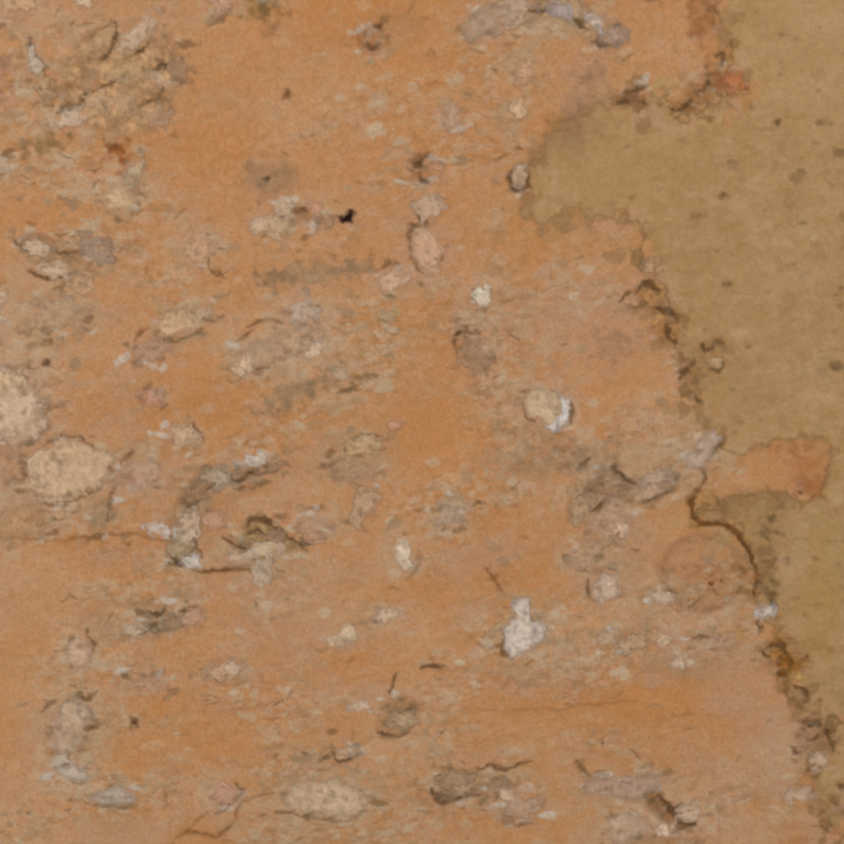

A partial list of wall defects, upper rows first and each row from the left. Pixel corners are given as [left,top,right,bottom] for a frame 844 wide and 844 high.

spalling [467,0,630,47]
peeling [509,0,844,844]
crack [689,498,756,567]
peeling [502,598,546,658]
spalling [431,764,544,817]